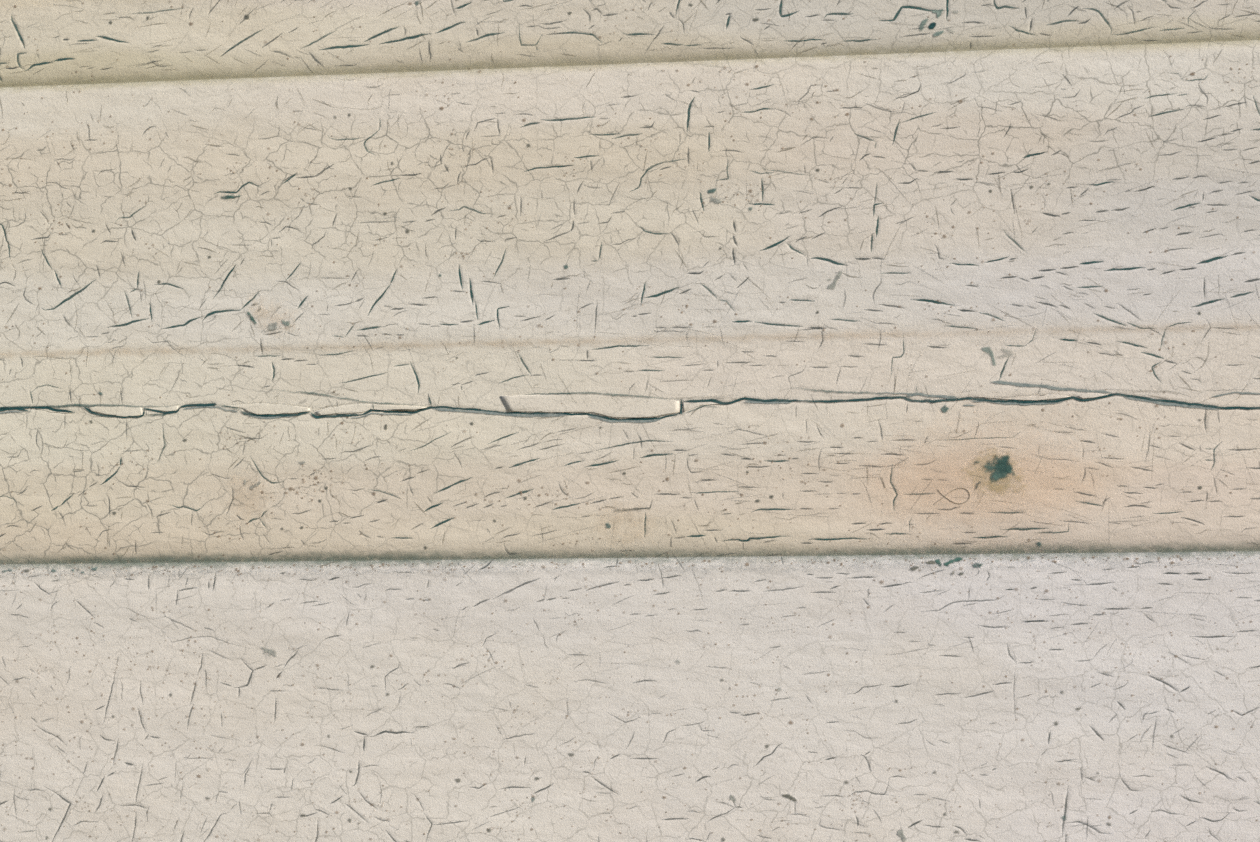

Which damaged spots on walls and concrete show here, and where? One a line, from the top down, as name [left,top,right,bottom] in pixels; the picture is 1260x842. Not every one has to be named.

crack [0,18,128,81]
crack [0,192,141,325]
crack [102,121,381,334]
crack [239,73,1260,404]
crack [0,458,136,537]
crack [298,415,1260,605]
crack [188,654,296,721]
crack [940,566,1237,697]
crack [1151,630,1253,691]
crack [52,682,159,838]
crack [305,726,462,842]
crack [1063,799,1101,833]